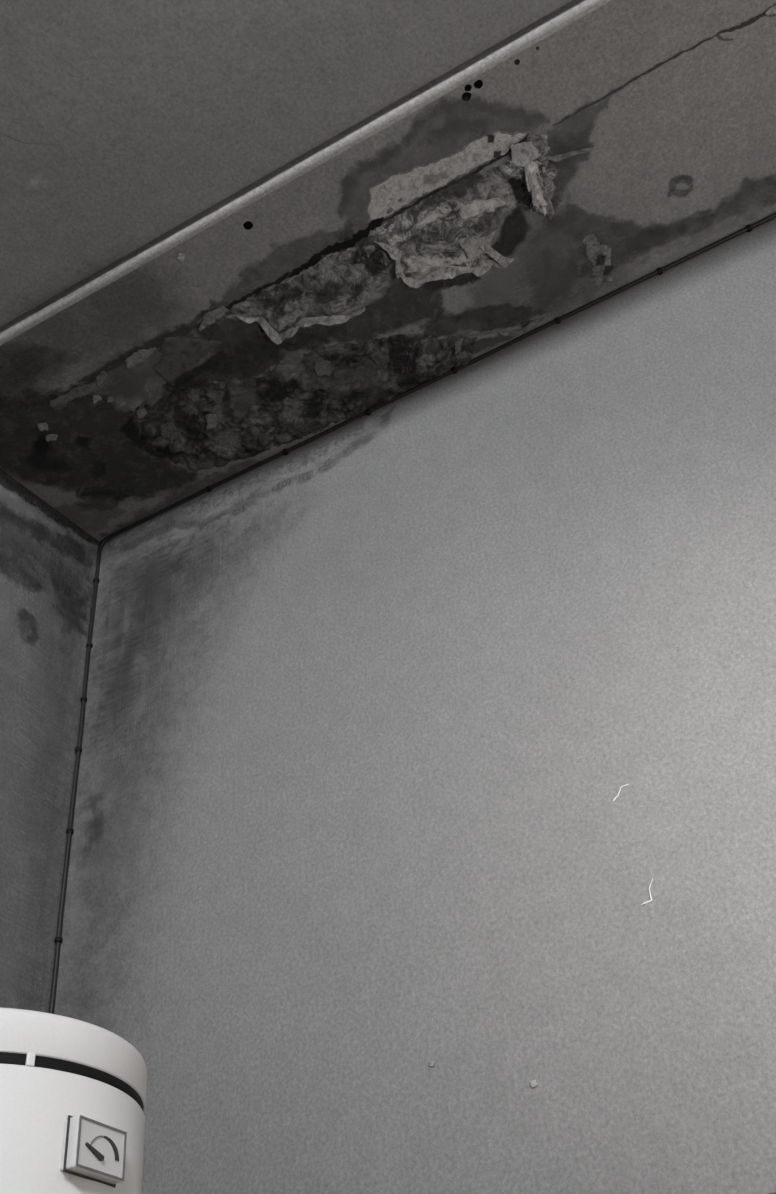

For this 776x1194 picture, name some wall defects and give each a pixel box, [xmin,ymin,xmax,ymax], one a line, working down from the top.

damp [0,507,87,632]
damp [0,351,197,500]
peeling [0,130,595,548]
damp [182,96,776,389]
crack [225,5,774,309]